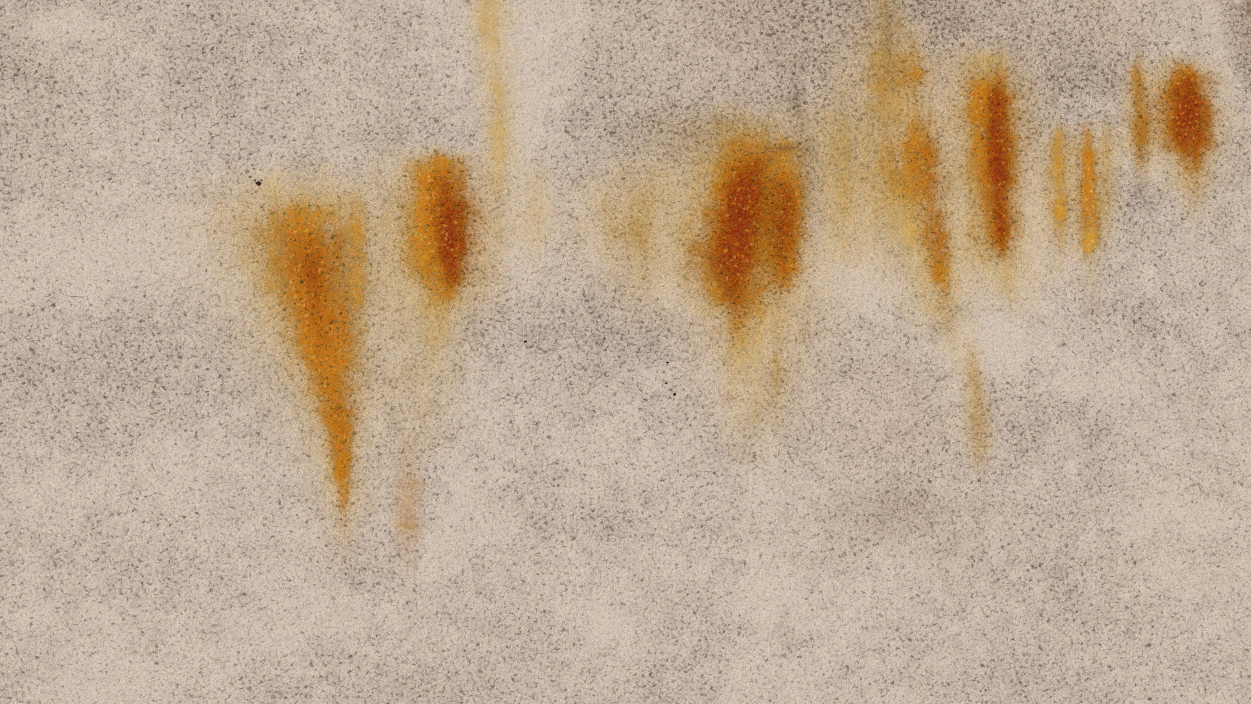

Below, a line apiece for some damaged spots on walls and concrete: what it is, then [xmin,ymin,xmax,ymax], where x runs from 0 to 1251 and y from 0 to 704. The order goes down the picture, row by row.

corrosion [246,186,368,517]
corrosion [400,152,482,352]
corrosion [679,123,806,386]
corrosion [867,34,954,314]
corrosion [960,53,1022,293]
corrosion [1046,127,1110,254]
corrosion [1130,63,1214,179]